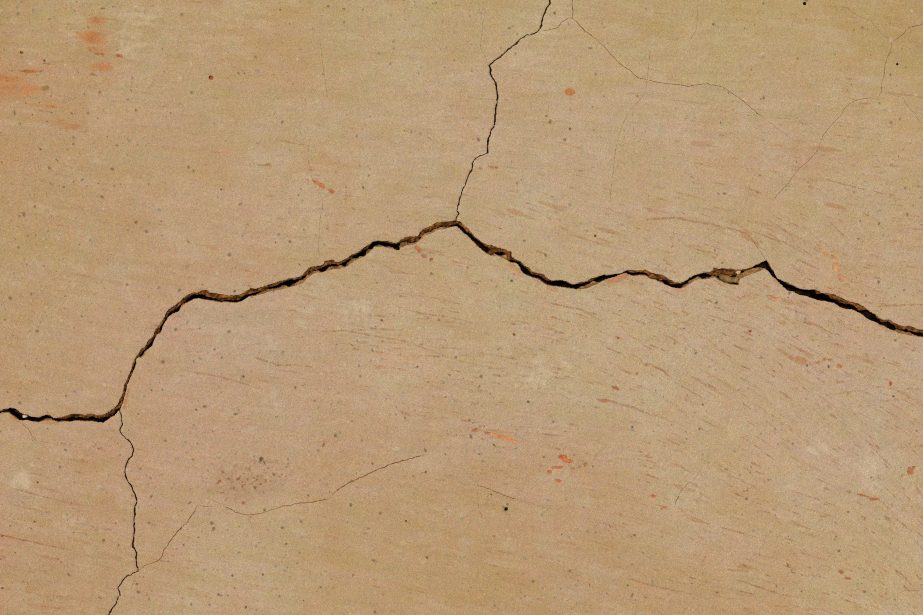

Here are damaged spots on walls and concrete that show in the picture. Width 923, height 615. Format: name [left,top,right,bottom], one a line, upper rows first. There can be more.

crack [456,0,551,219]
crack [776,24,923,196]
crack [0,219,923,595]